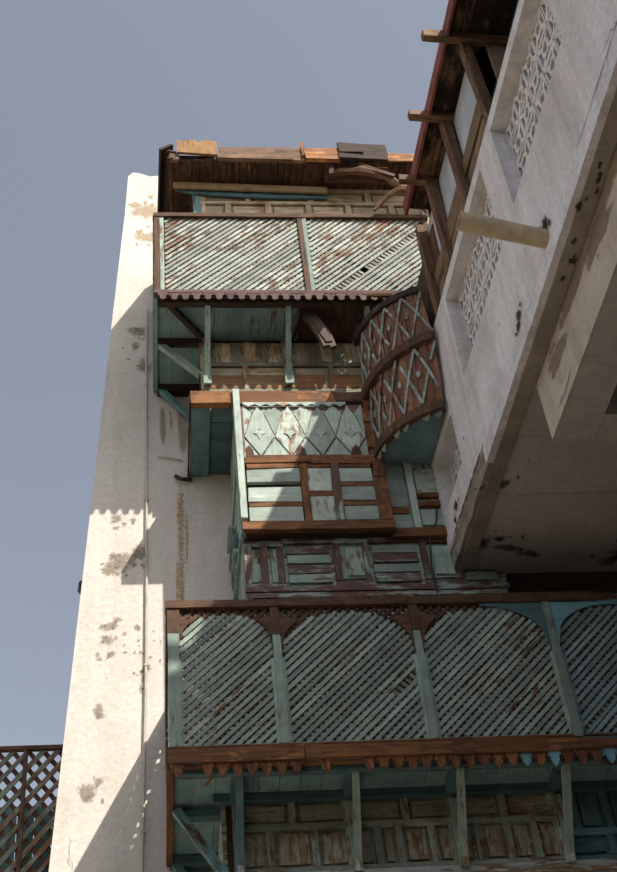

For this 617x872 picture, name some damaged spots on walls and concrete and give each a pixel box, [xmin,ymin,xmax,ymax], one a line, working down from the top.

water stain [548,149,617,377]
water stain [101,546,145,577]
corrosion [176,490,189,600]